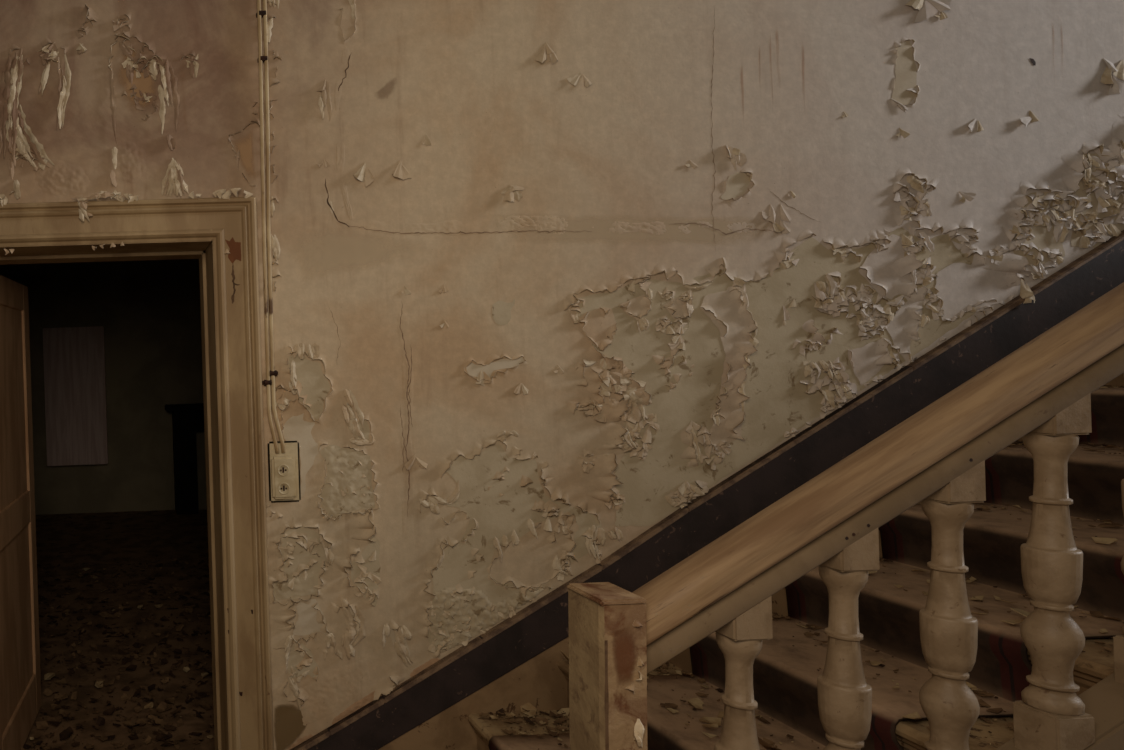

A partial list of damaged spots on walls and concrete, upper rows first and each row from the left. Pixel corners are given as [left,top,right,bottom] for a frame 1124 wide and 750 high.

peeling [0,4,253,222]
peeling [250,0,282,292]
peeling [889,37,921,112]
peeling [905,0,951,23]
peeling [266,114,1124,750]